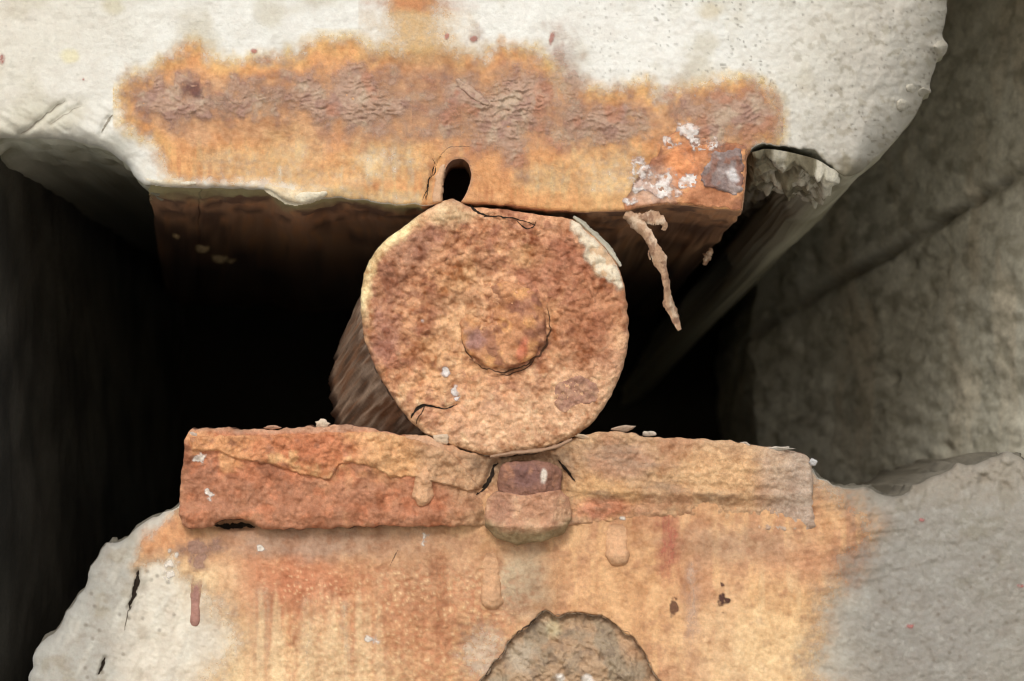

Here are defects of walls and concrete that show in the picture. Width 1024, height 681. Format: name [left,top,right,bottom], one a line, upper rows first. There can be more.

corrosion [116,0,784,212]
peeling [622,123,840,331]
crack [124,570,140,630]
corrosion [134,419,871,681]
spalling [481,611,659,681]